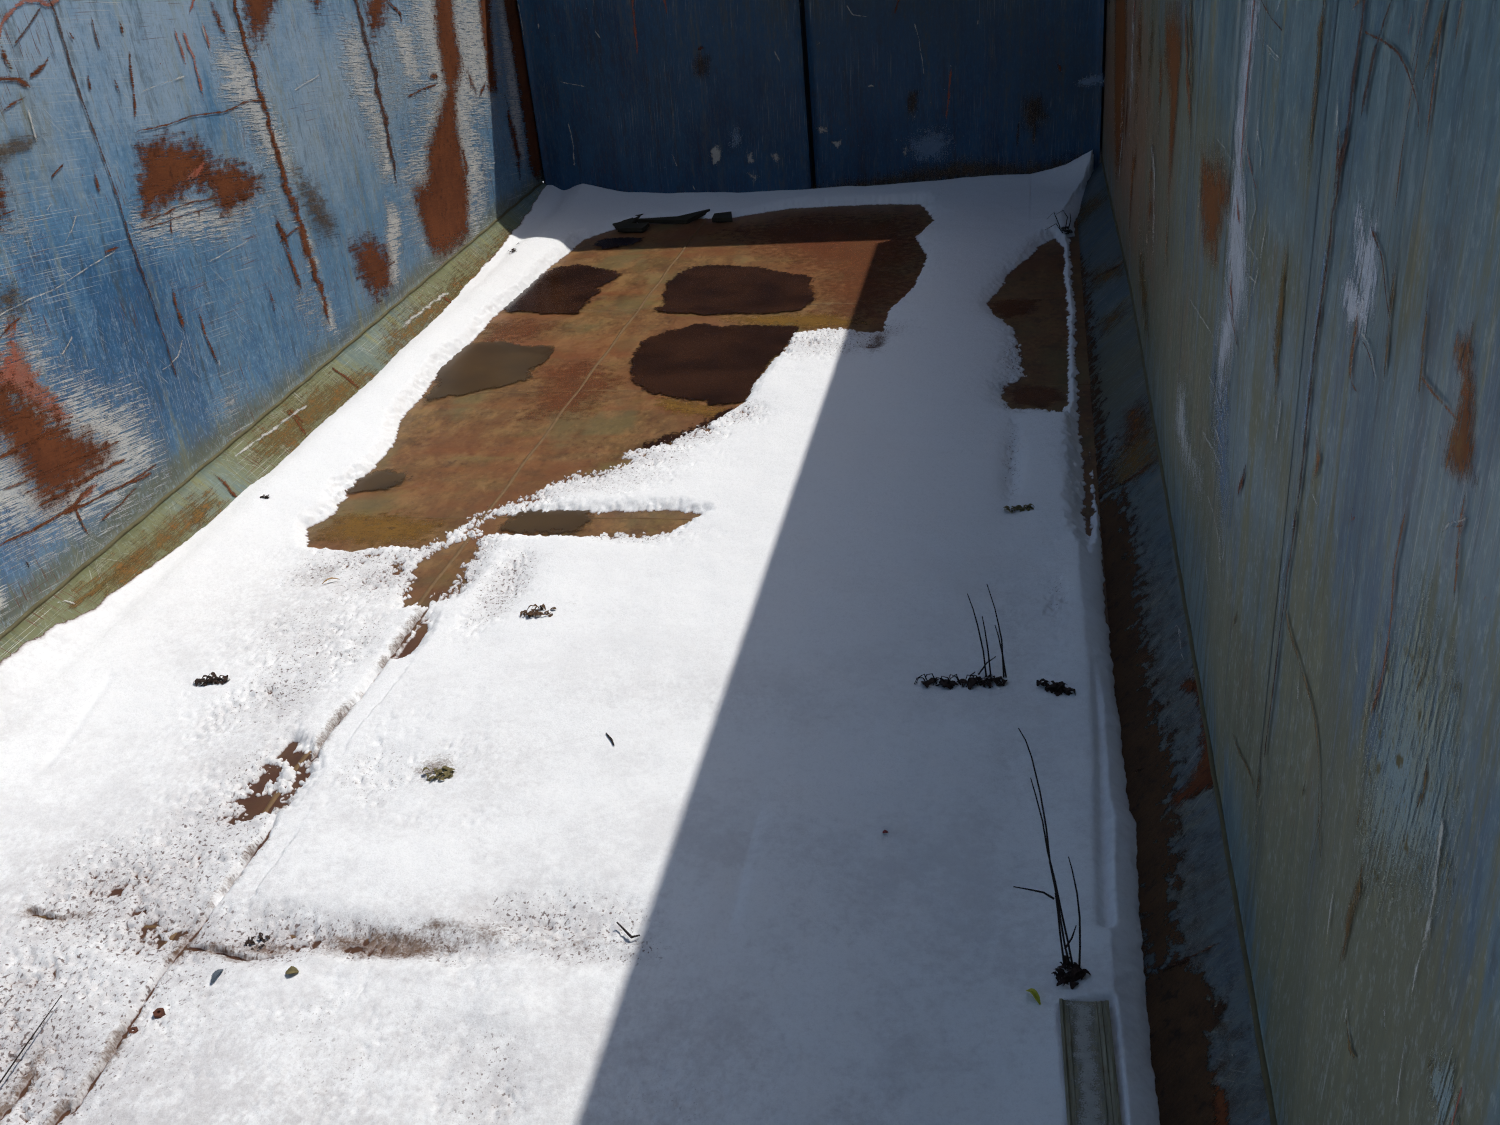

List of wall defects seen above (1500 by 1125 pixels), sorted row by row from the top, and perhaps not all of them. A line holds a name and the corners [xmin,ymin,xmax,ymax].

rust [0,135,38,233]
rust [132,0,553,464]
rust [0,282,157,546]
rust [1418,288,1476,594]